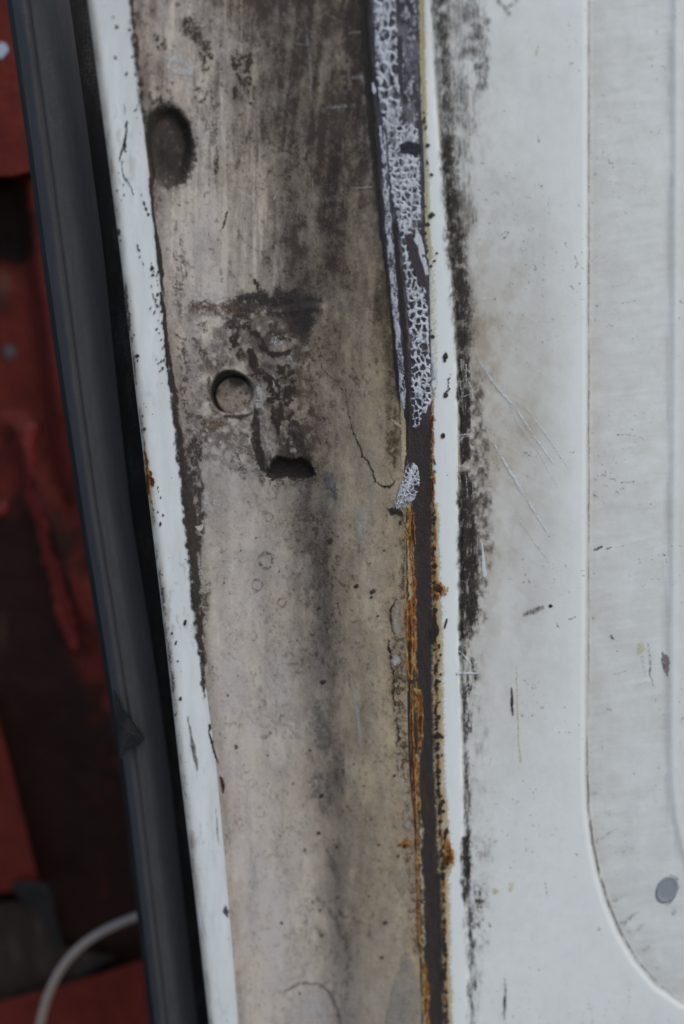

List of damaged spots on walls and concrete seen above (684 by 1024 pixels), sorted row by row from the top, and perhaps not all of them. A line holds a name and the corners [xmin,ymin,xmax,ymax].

spalling [400,141,422,157]
spalling [405,233,427,287]
leakage [129,0,323,698]
rust [140,410,155,505]
crack [320,353,420,509]
leakage [431,0,493,968]
rust [391,387,455,1024]